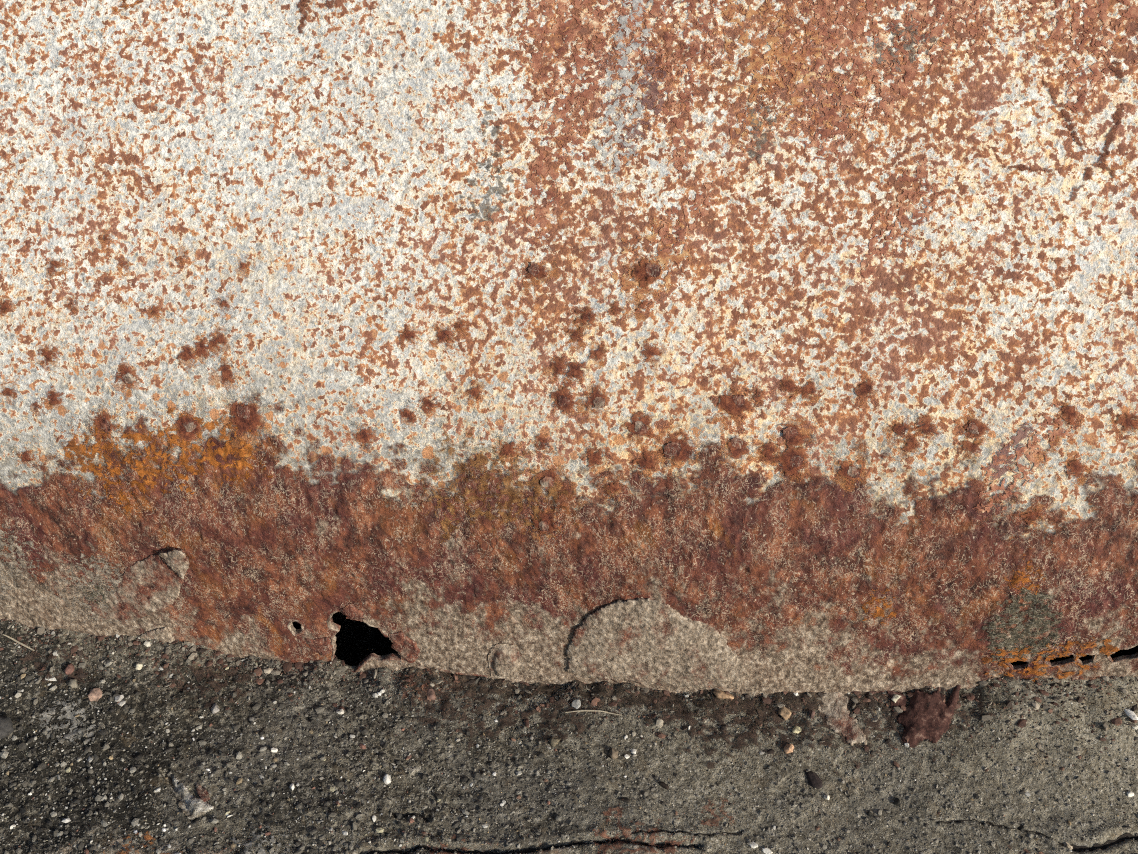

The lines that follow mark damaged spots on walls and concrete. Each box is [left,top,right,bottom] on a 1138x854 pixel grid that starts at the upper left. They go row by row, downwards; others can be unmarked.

rust [496,0,1138,414]
rust [437,319,467,346]
rust [38,345,59,369]
rust [32,386,65,412]
rust [115,363,140,390]
rust [467,380,482,400]
rust [706,386,766,421]
rust [0,394,1138,748]
peeling [340,604,364,622]
crack [367,813,746,854]
crack [936,819,1138,852]